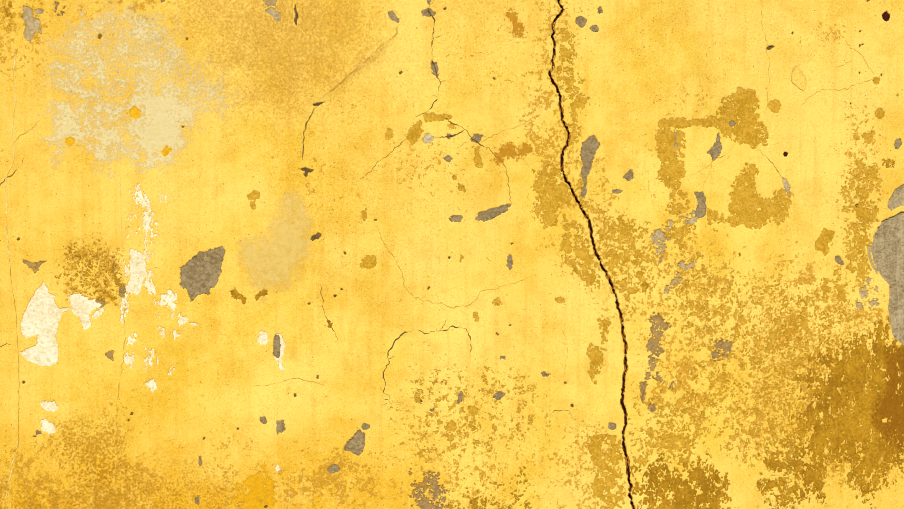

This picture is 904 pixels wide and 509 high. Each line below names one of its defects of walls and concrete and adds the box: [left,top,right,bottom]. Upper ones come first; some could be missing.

peeling [2,1,44,42]
crack [0,49,40,385]
peeling [20,184,225,369]
peeling [230,289,268,304]
peeling [406,112,456,146]
crack [377,225,527,405]
peeling [470,134,484,168]
peeling [475,204,511,222]
crack [415,0,635,509]
peeling [531,16,904,509]
crack [3,410,31,507]
peeling [395,366,551,509]